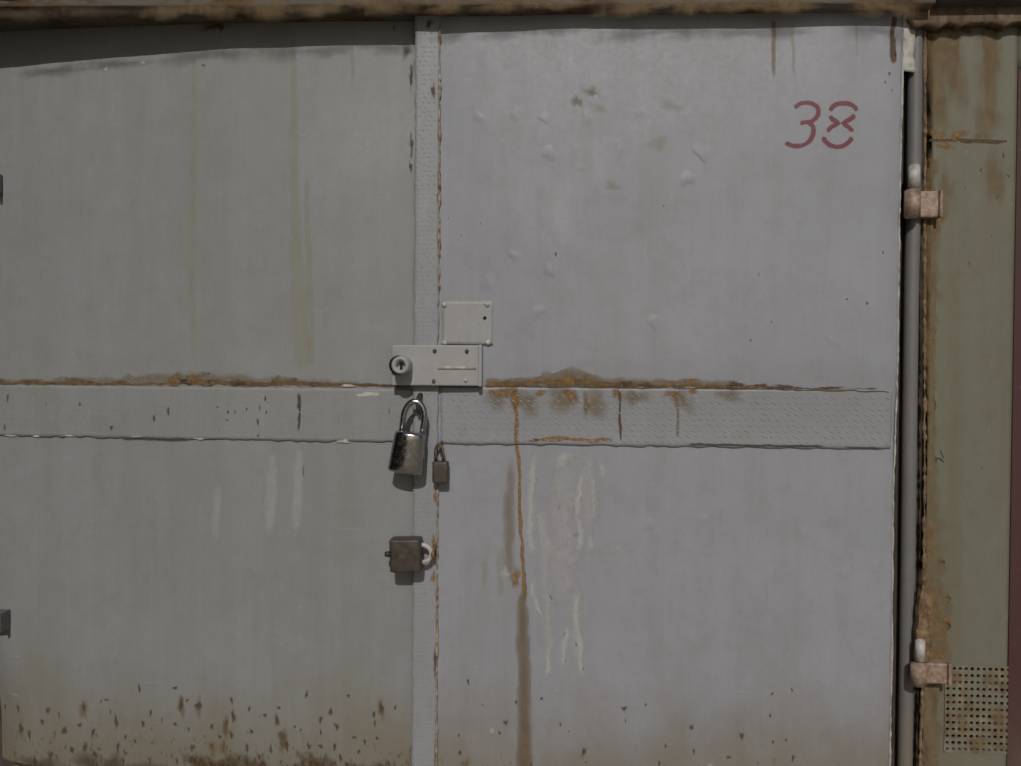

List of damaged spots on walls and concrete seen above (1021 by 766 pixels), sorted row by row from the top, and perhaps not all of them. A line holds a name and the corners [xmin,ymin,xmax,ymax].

rust [0,374,409,436]
rust [486,376,843,766]
rust [176,698,265,766]
rust [302,709,348,766]